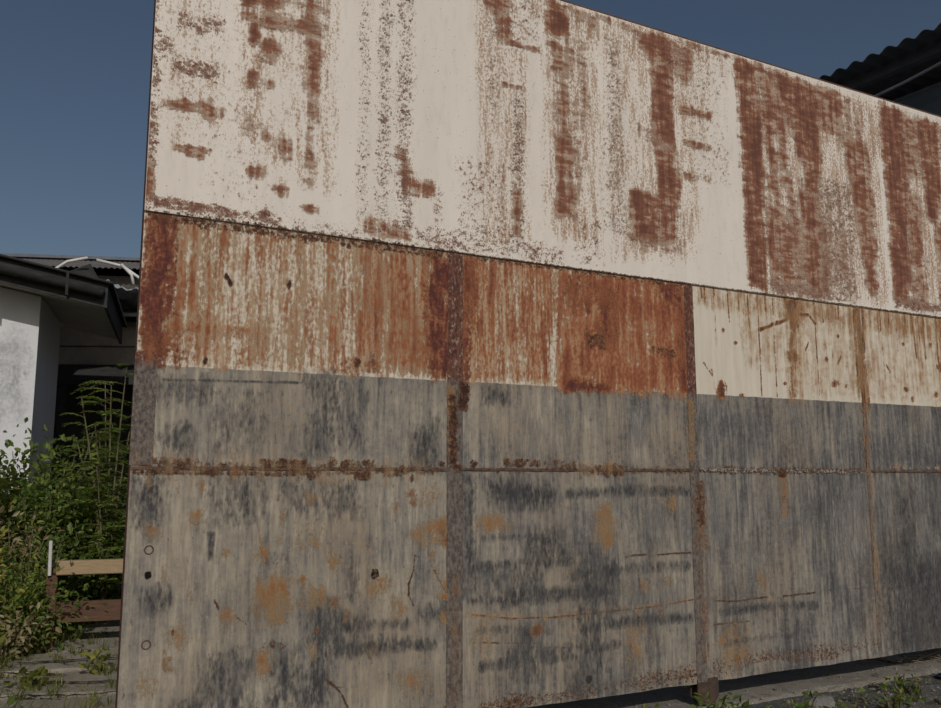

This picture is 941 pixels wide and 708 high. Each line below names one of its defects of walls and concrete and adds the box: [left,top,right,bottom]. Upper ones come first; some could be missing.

corrosion [132,0,941,555]
corrosion [253,535,348,627]
corrosion [481,578,878,708]